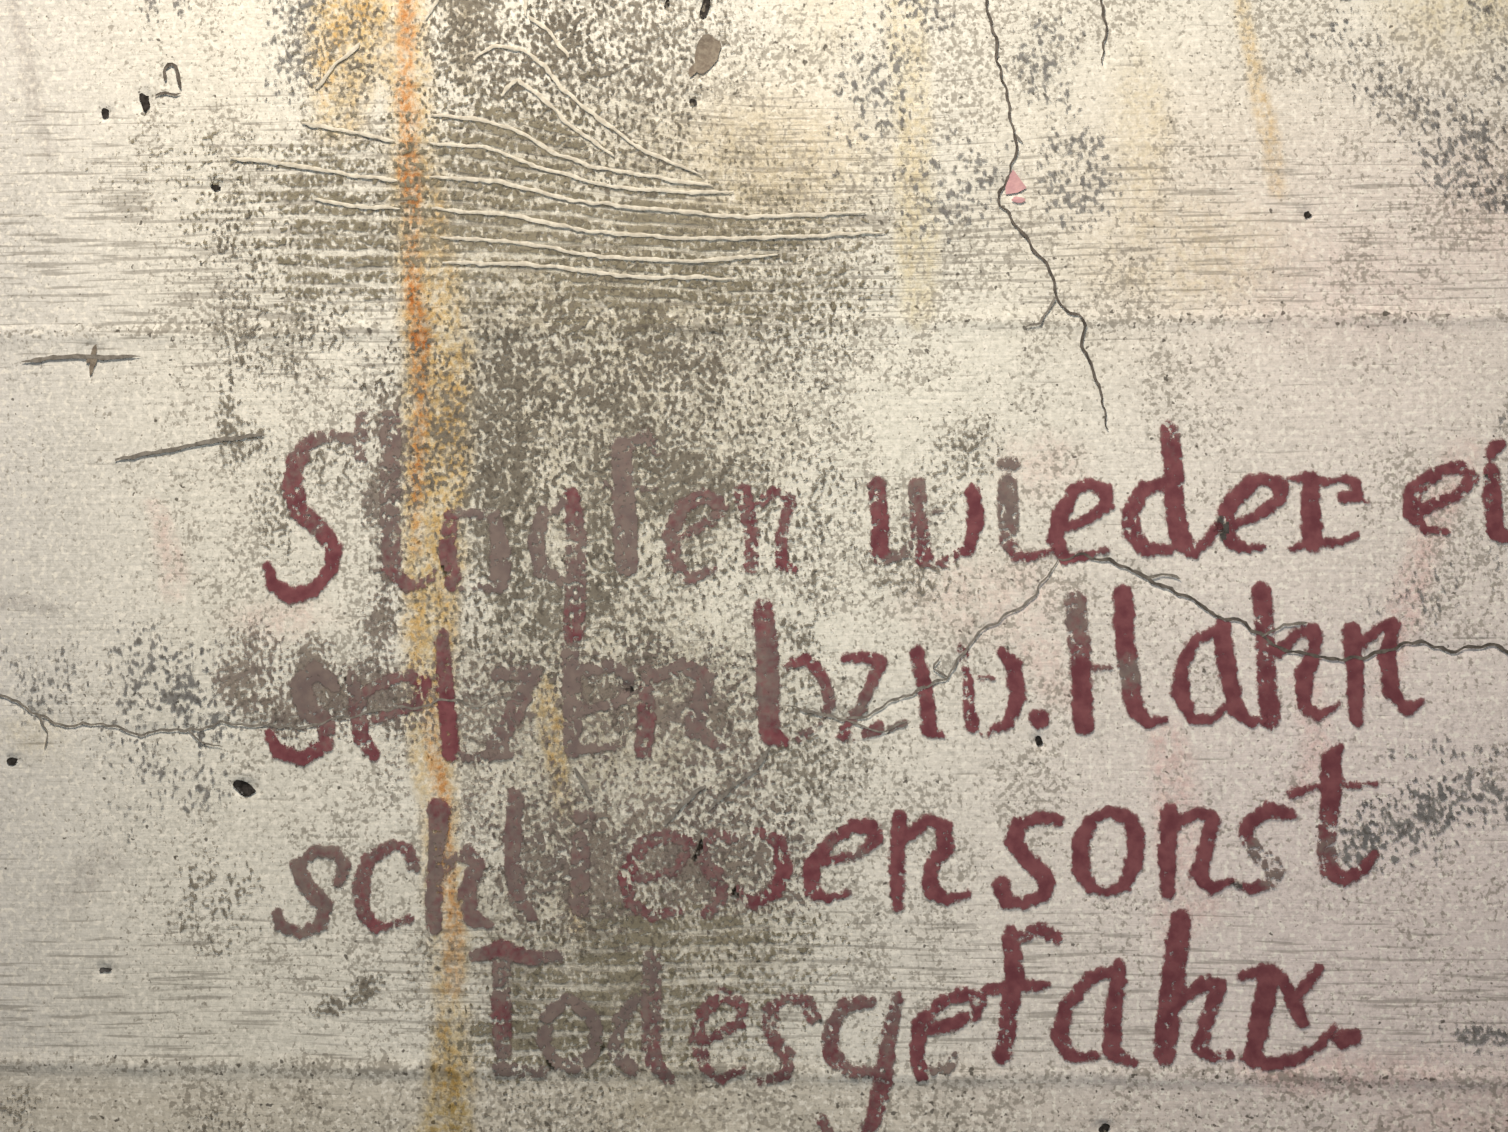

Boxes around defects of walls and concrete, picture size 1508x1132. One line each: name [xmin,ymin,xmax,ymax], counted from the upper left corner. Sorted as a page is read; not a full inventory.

crack [985,0,1109,430]
crack [0,694,522,748]
crack [787,552,1508,733]